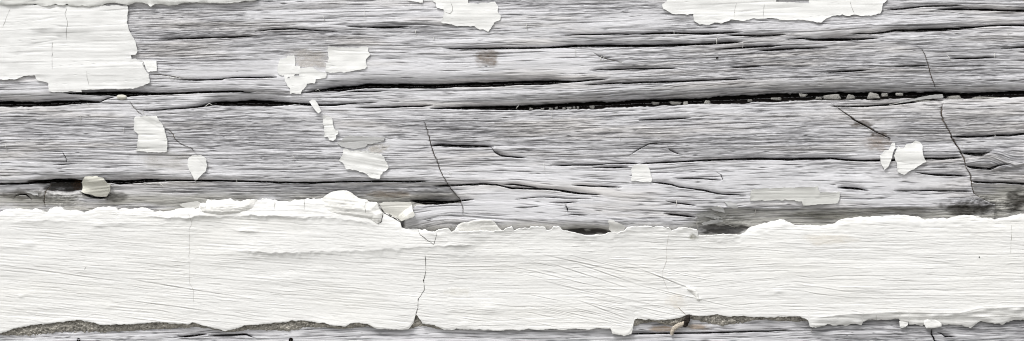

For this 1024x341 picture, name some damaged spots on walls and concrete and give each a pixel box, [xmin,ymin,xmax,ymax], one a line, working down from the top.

peeling [408,0,501,32]
peeling [662,0,887,25]
peeling [277,46,389,179]
crack [0,5,1024,217]
peeling [134,115,168,153]
peeling [188,155,207,180]
peeling [880,141,926,175]
peeling [379,202,415,221]
crack [380,209,436,316]
spalling [0,320,374,336]
spalling [409,315,441,329]
spalling [634,314,808,326]